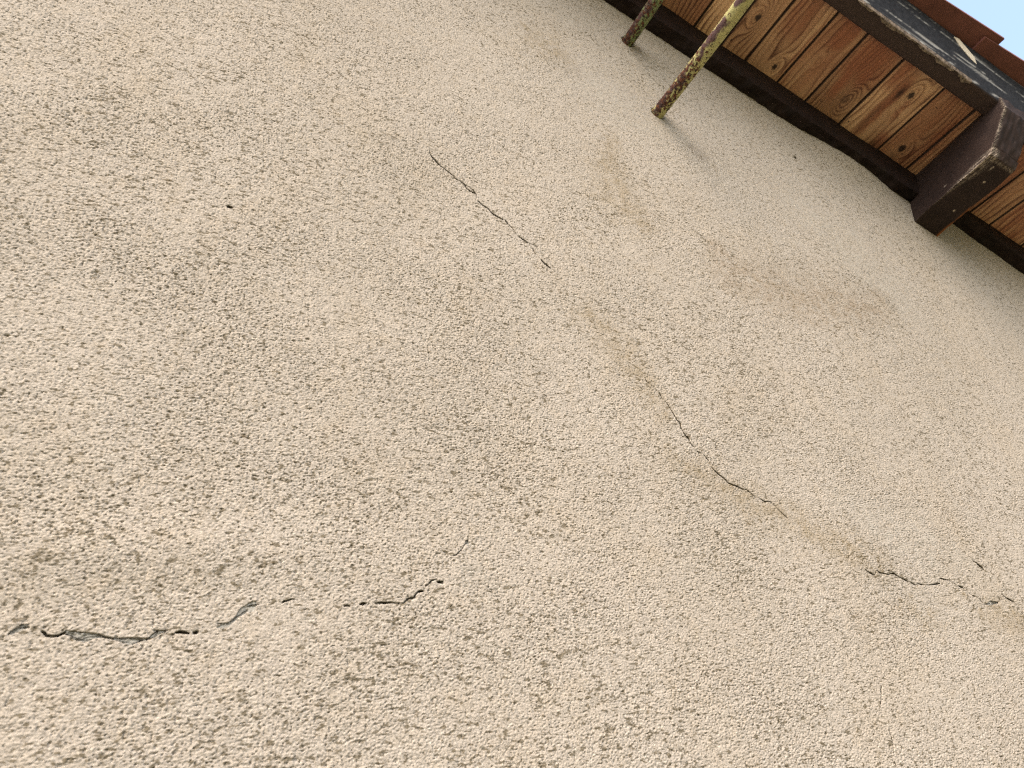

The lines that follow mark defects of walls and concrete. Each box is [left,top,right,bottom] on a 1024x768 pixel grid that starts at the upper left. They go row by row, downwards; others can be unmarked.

crack [429,149,551,269]
crack [646,381,786,517]
crack [344,580,443,607]
crack [866,570,1015,605]
crack [8,601,257,645]